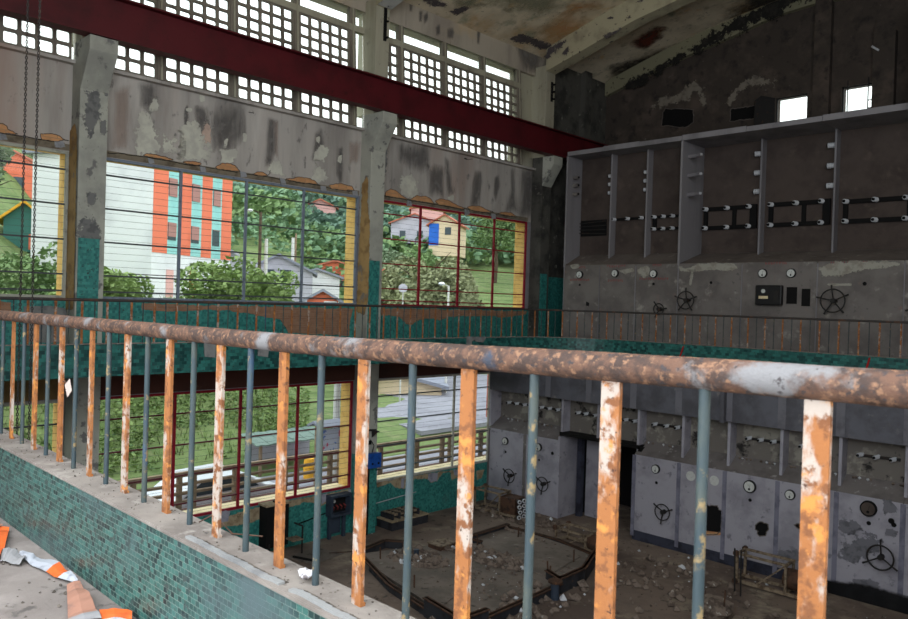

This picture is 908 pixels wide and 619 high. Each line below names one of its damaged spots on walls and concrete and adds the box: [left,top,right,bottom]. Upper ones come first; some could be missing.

peeling [621,0,811,90]
leakage [143,86,153,107]
leakage [184,107,241,144]
flaking render [24,90,108,315]
spalling [706,504,723,536]
spalling [755,521,769,537]